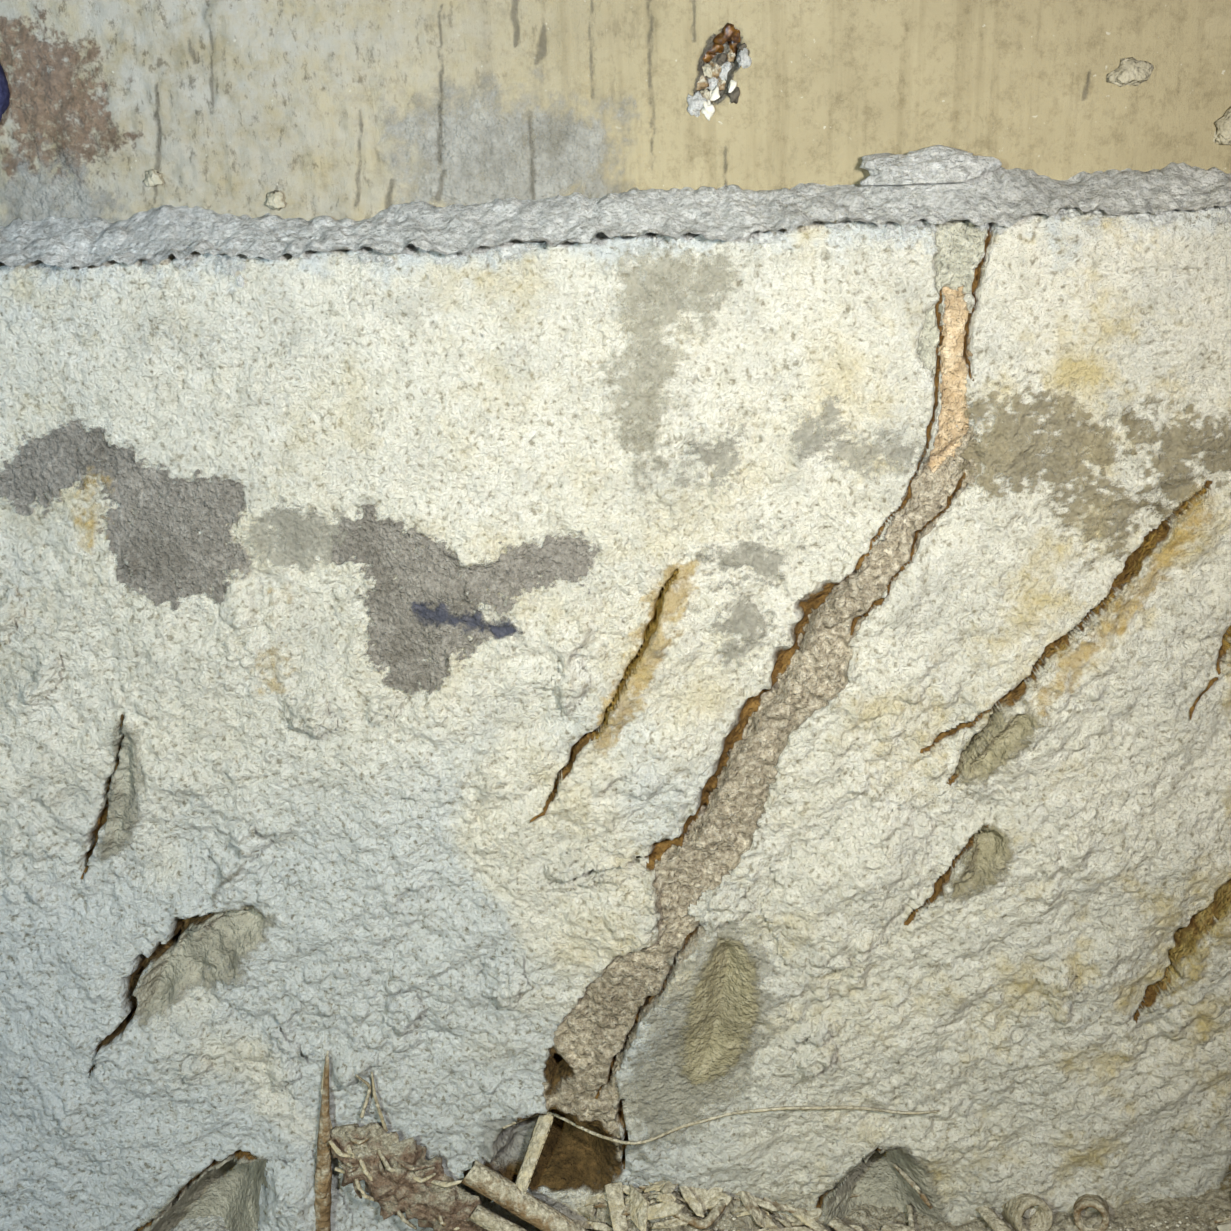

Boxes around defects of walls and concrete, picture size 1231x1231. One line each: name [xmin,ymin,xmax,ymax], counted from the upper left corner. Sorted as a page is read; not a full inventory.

water stain [0,12,138,228]
water stain [957,369,1231,569]
crack [483,220,992,1193]
crack [920,480,1213,786]
crack [1189,625,1231,720]
spalling [80,714,144,879]
spalling [88,906,276,1075]
spalling [904,825,1012,926]
crack [1133,879,1231,1023]
spalling [174,1149,257,1199]